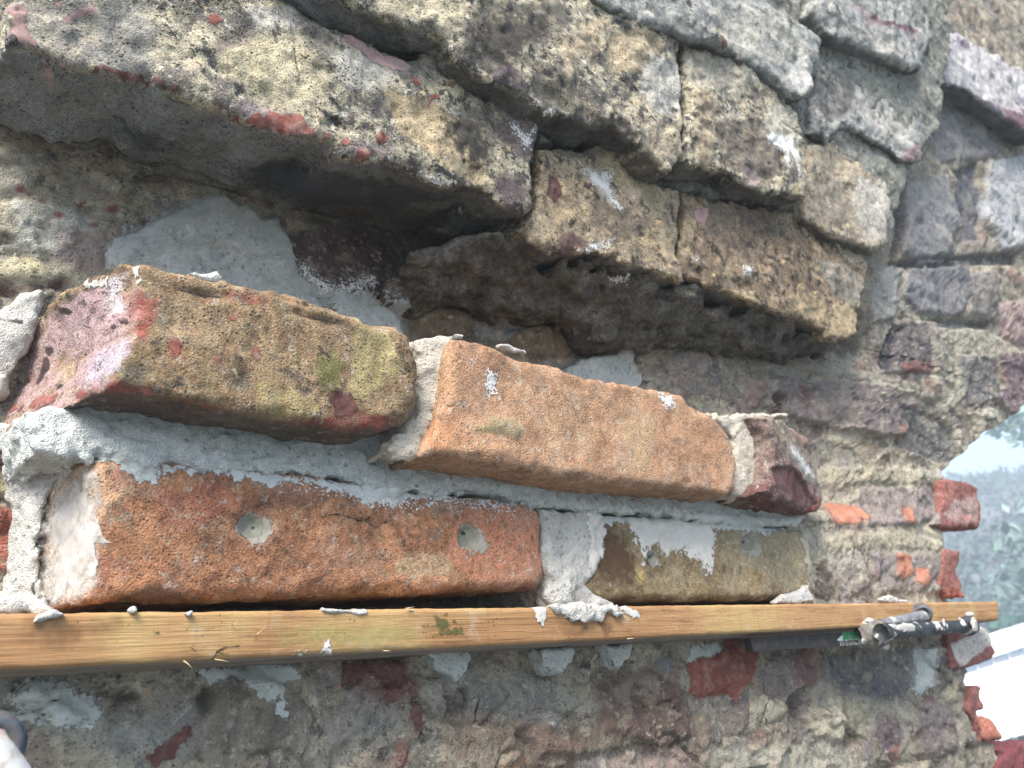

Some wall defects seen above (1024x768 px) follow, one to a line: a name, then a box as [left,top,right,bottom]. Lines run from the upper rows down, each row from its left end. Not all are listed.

spalling [903,507,915,522]
spalling [928,479,981,532]
spalling [897,549,965,599]